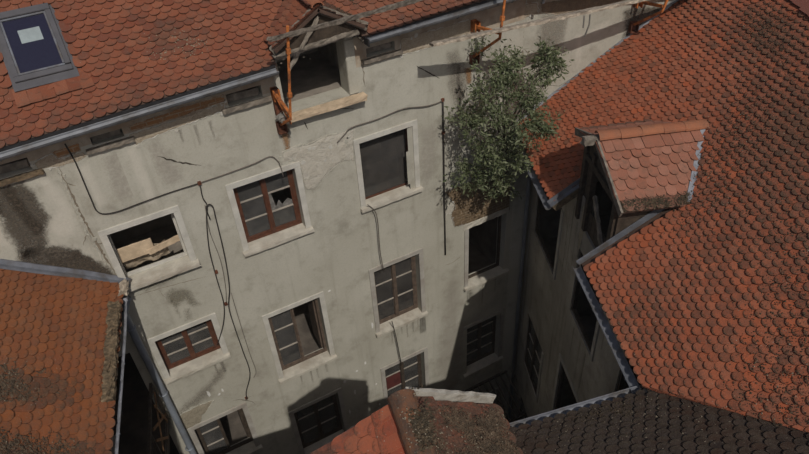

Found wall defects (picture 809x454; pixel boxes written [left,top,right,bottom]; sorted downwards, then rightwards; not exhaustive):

flaking render [129,93,227,148]
spalling [279,130,355,190]
water stain [0,124,200,275]